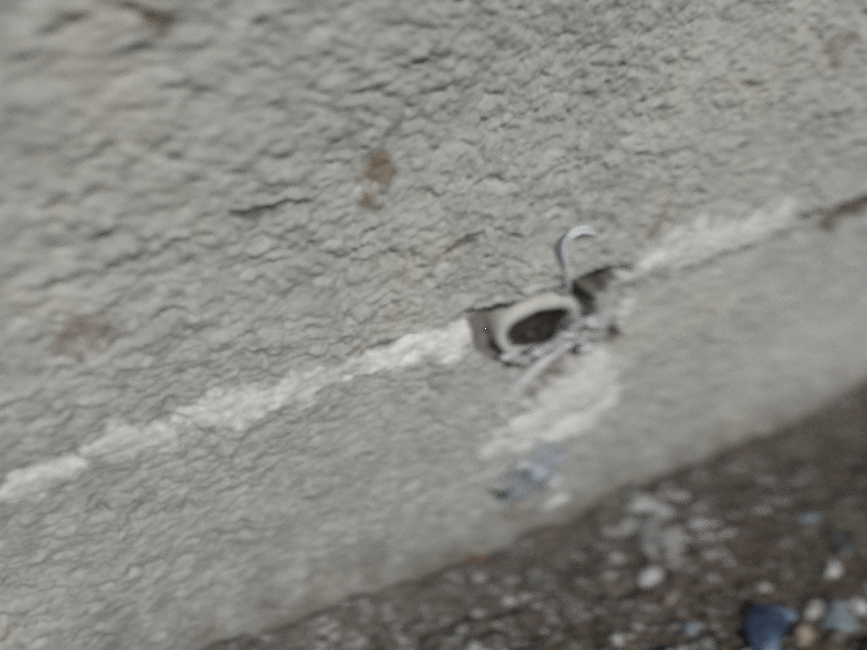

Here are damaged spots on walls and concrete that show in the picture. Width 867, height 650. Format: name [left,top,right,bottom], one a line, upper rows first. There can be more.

crack [445,231,482,253]
spalling [558,265,628,318]
crack [360,339,396,353]
spalling [466,307,579,419]
spalling [603,323,620,345]
peeling [499,438,573,506]